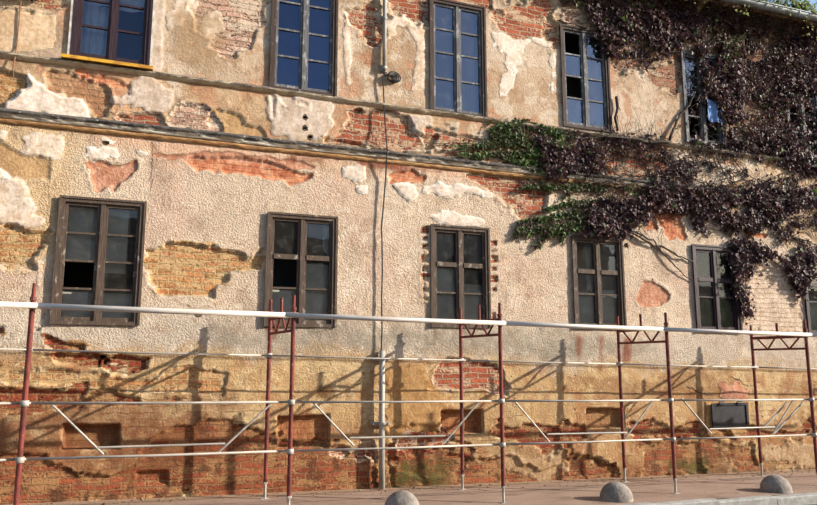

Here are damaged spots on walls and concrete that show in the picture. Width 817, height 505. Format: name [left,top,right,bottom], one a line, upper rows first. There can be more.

peeling [0,0,754,194]
flaking render [0,130,66,292]
flaking render [143,239,266,306]
flaking render [636,278,671,308]
flaking render [743,258,804,341]
flaking render [0,333,228,415]
flaking render [0,357,622,504]
flaking render [626,417,817,477]